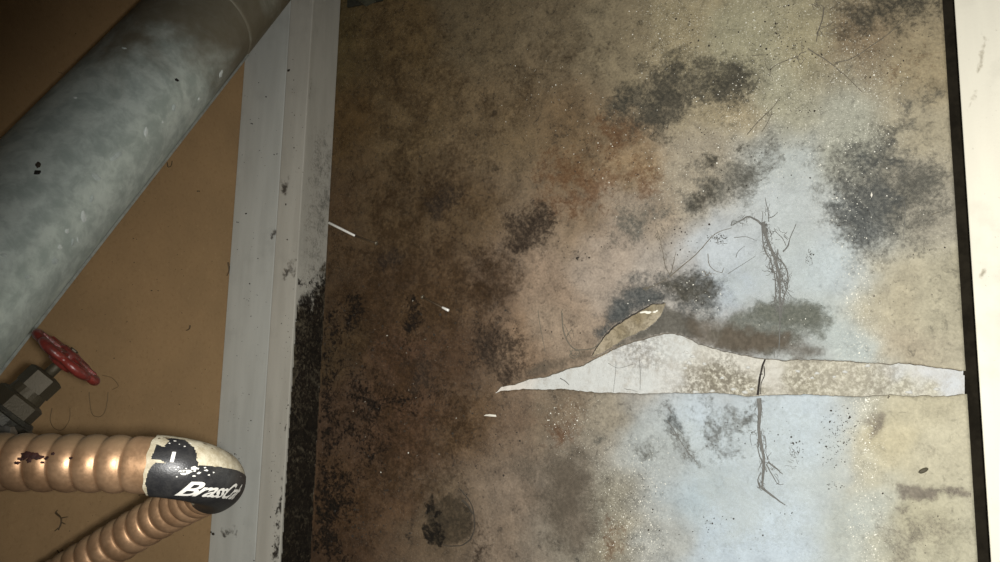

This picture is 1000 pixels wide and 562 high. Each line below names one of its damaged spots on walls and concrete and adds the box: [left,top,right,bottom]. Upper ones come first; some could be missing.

leakage [607,4,838,136]
leakage [496,200,590,262]
leakage [620,127,788,258]
leakage [829,127,945,244]
leakage [273,244,521,562]
leakage [597,274,831,354]
peeling [496,333,965,397]
crack [756,359,766,395]